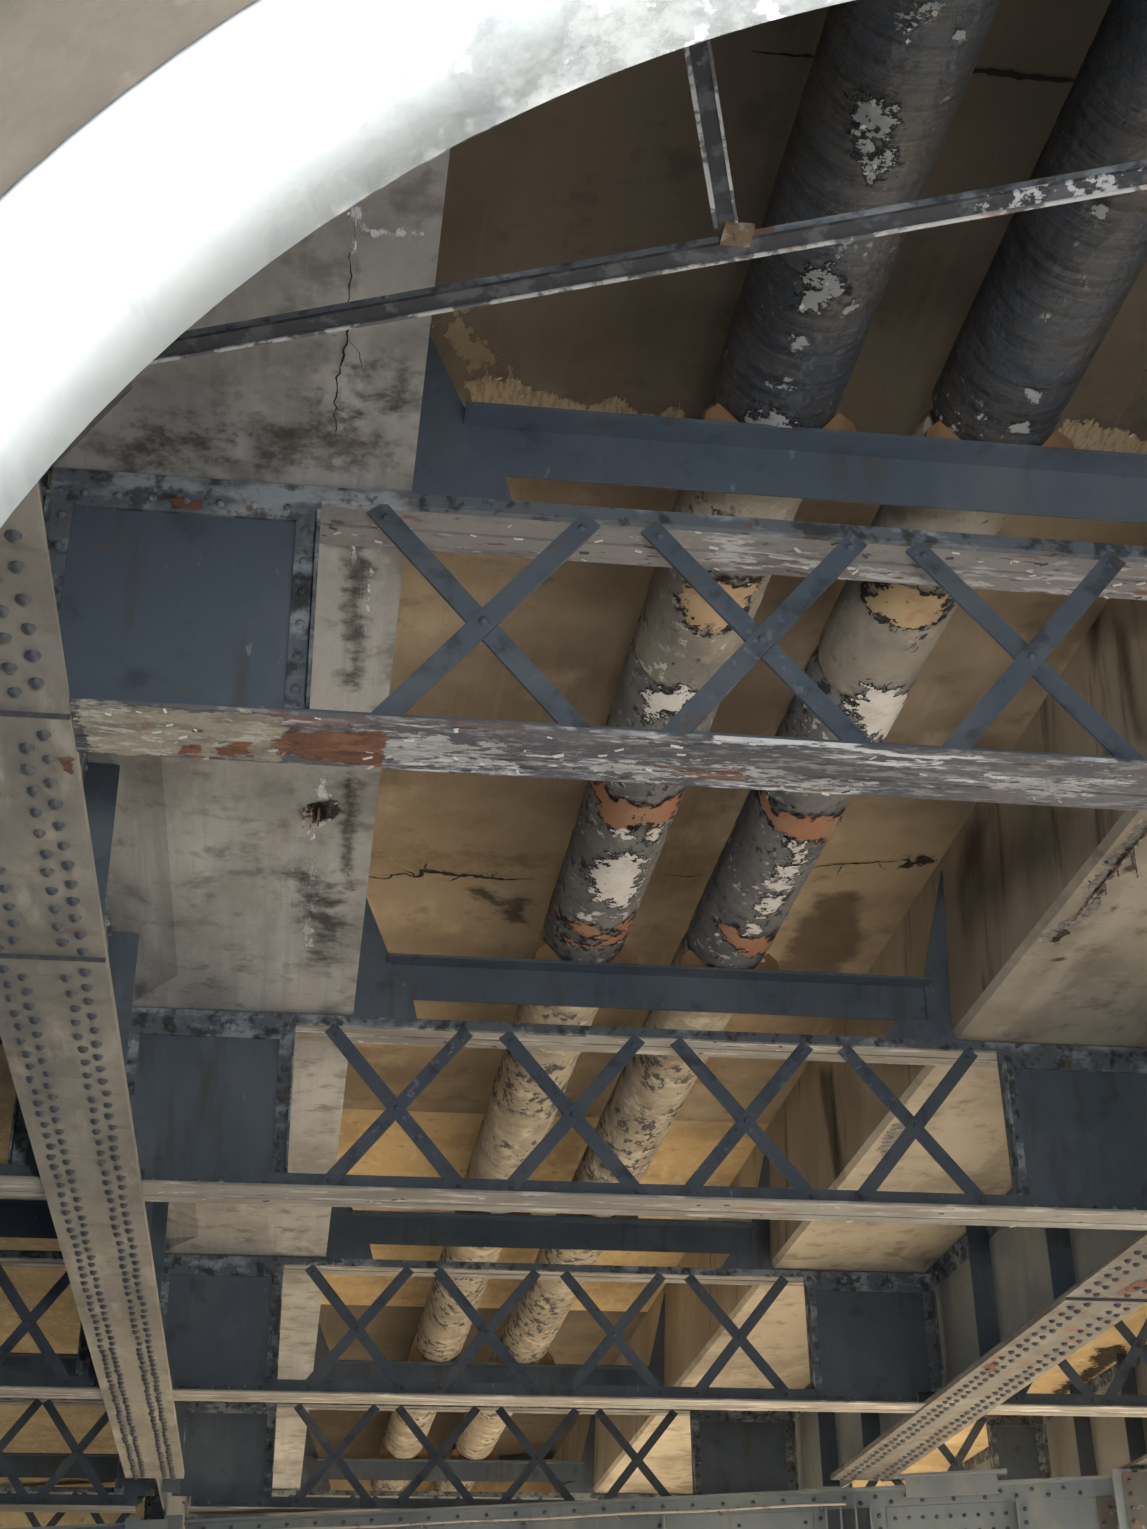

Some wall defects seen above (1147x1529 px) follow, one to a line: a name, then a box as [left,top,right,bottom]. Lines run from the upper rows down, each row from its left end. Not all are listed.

peeling [851,92,900,185]
crack [333,204,362,445]
peeling [149,184,1147,418]
mould [250,410,380,468]
water stain [344,546,379,686]
peeling [677,582,729,634]
peeling [717,580,760,608]
rust [178,726,391,769]
peeling [986,765,1123,806]
water stain [286,773,356,954]
crack [369,863,534,882]
peeling [548,758,879,962]